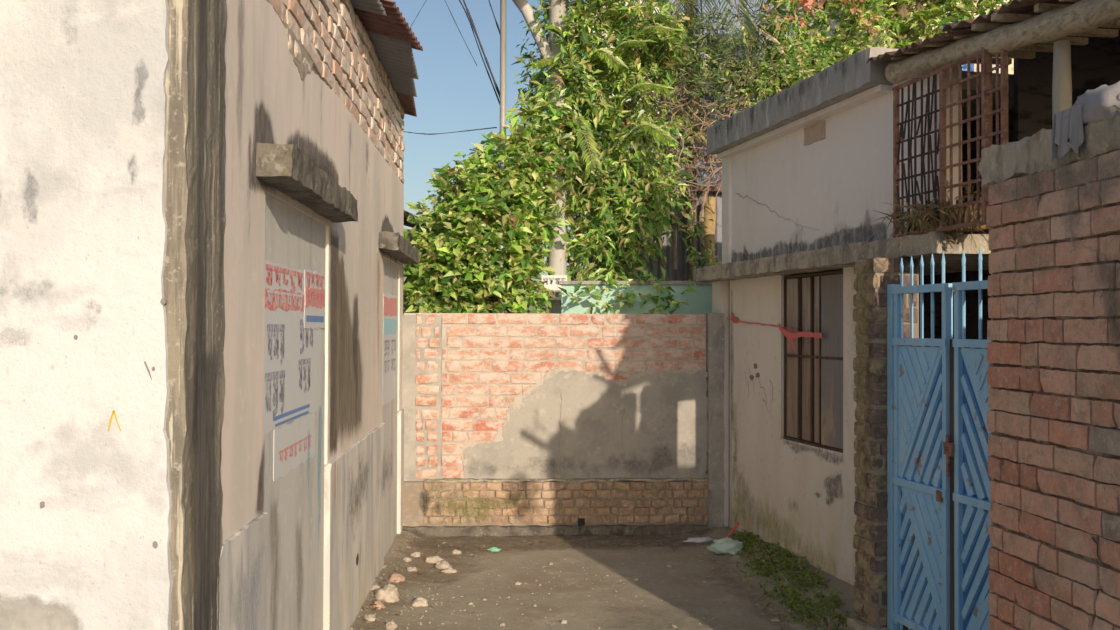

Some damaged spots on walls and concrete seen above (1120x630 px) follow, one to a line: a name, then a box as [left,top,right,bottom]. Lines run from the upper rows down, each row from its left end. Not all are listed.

flaking render [284,22,315,81]
water stain [249,103,339,189]
water stain [382,216,394,232]
water stain [309,233,362,519]
flaking render [415,313,705,479]